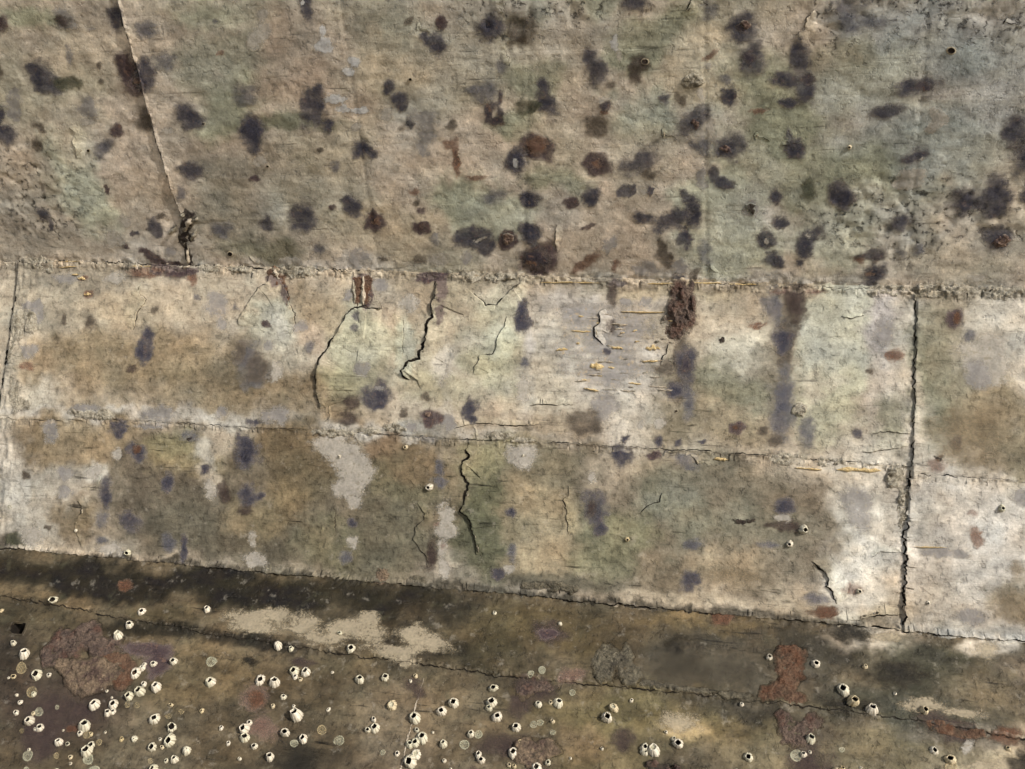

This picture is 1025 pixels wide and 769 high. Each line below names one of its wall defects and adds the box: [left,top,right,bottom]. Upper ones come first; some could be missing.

water stain [25,57,82,95]
water stain [726,10,816,108]
water stain [632,189,709,280]
water stain [658,94,748,190]
water stain [756,189,826,269]
water stain [951,114,1025,250]
crack [314,280,529,422]
rust [660,279,699,341]
crack [456,398,573,555]
crack [413,501,434,568]
rust [20,619,174,764]
rust [757,644,833,769]